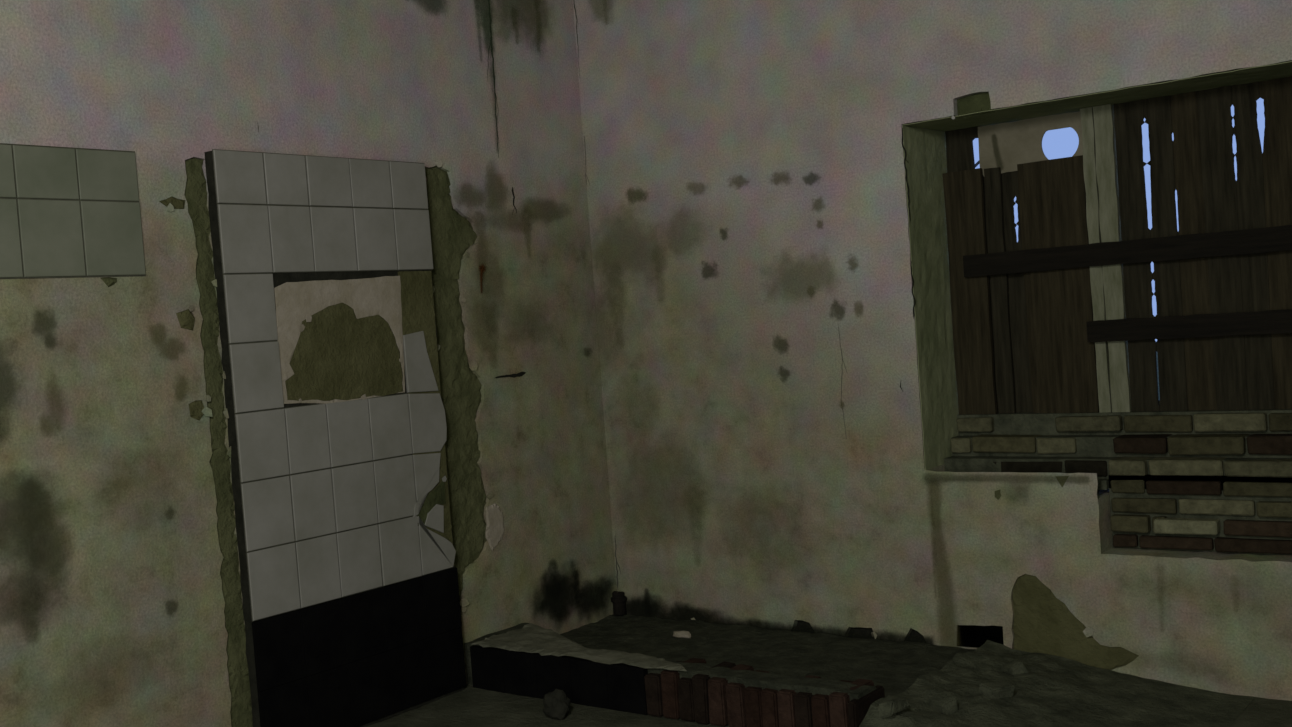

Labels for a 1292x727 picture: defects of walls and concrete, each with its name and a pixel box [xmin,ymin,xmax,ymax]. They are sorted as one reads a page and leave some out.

water stain [479,0,543,51]
spalling [285,160,504,612]
spalling [159,158,253,727]
water stain [534,562,611,623]
water stain [625,591,933,645]
spalling [1012,574,1139,670]